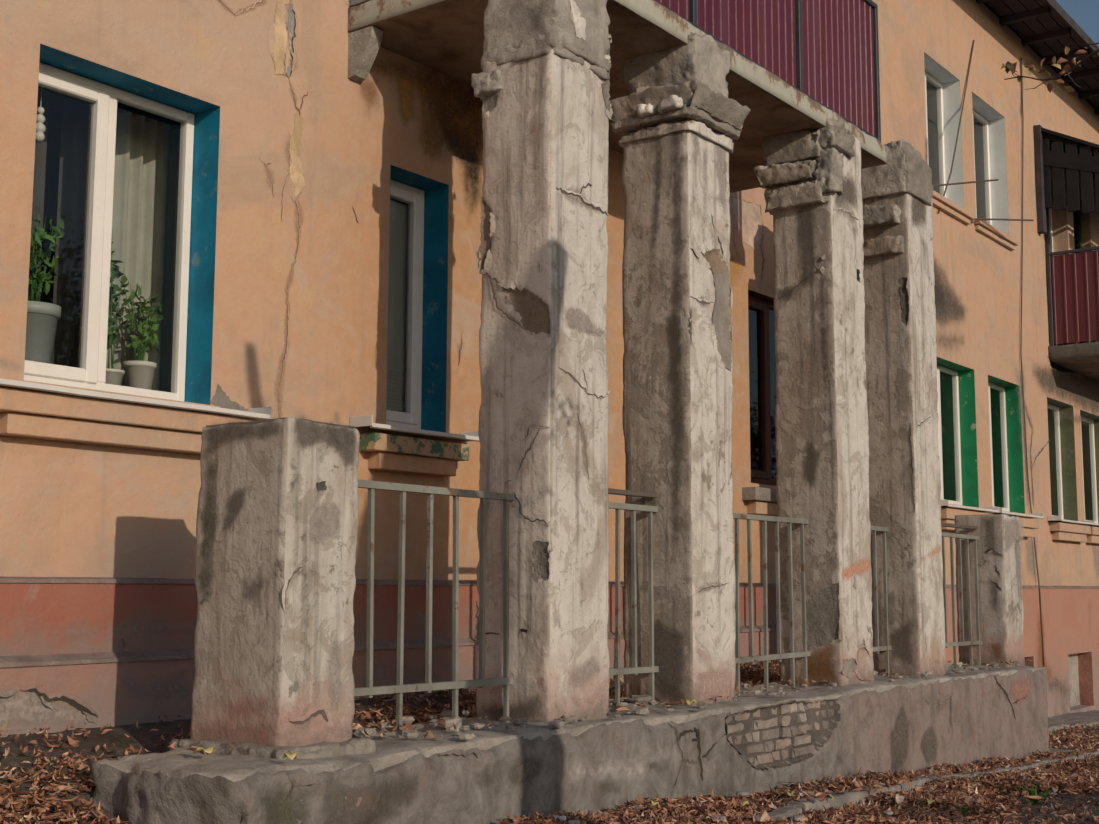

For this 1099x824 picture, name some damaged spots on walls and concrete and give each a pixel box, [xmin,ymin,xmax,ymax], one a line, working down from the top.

water stain [397,69,483,200]
crack [260,4,308,418]
spalling [476,197,496,274]
crack [557,183,609,216]
water stain [912,197,926,225]
spalling [496,279,550,340]
spalling [696,248,733,371]
water stain [934,264,964,320]
water stain [296,417,354,464]
crack [559,367,610,479]
crack [669,723,726,785]
flaking render [725,699,841,771]